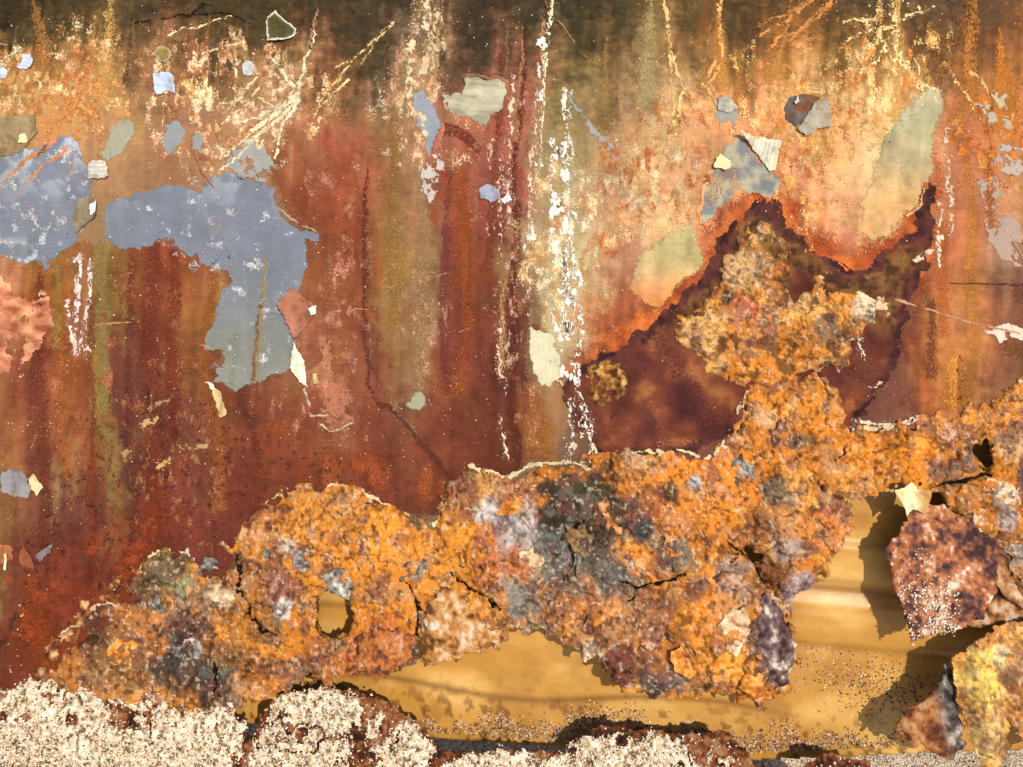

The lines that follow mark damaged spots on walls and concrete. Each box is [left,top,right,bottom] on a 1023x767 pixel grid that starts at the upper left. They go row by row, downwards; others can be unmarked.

peeling [0,469,43,498]
rust [84,0,174,107]
damp [30,250,245,560]
peeling [0,115,319,418]
crack [235,554,278,636]
rust [0,30,801,716]
crack [450,572,501,610]
damp [0,0,1023,467]
crack [620,574,686,604]
peeling [626,95,782,309]
rust [559,0,1023,619]
peeling [784,94,832,136]